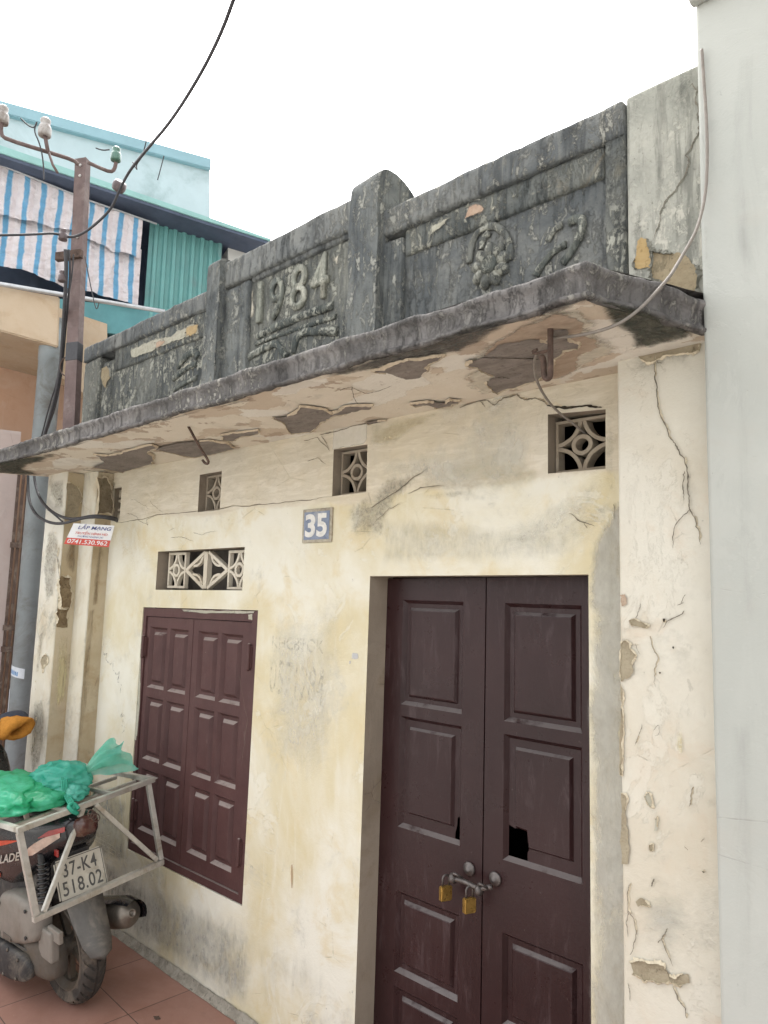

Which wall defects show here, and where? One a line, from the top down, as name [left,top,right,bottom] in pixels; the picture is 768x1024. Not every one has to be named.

crack [654,83,699,238]
peeling [464,199,499,222]
spalling [632,237,703,292]
peeling [131,322,198,357]
spalling [370,354,447,380]
spalling [271,404,387,435]
spalling [92,429,261,516]
crack [87,470,322,541]
crack [371,469,440,522]
crack [654,355,702,544]
spalling [45,532,74,628]
spalling [629,957,690,988]